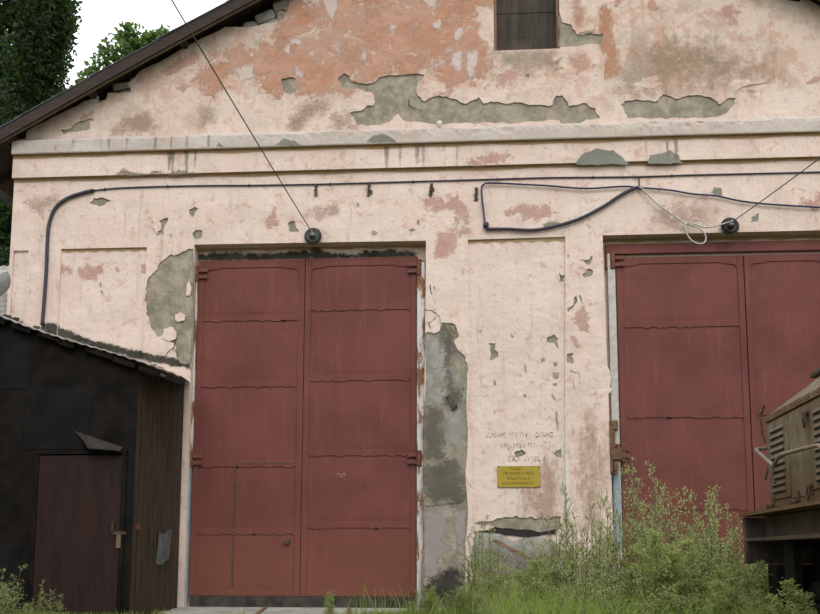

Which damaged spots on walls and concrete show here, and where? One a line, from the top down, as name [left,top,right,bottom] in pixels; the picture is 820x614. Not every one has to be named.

peeling [160,0,603,143]
spalling [621,82,770,119]
spalling [61,111,94,134]
spalling [576,148,629,165]
spalling [648,150,682,164]
peeling [423,196,471,259]
peeling [61,262,103,294]
spalling [141,249,195,364]
peeling [568,295,590,332]
damp [42,322,191,370]
spalling [421,322,562,601]